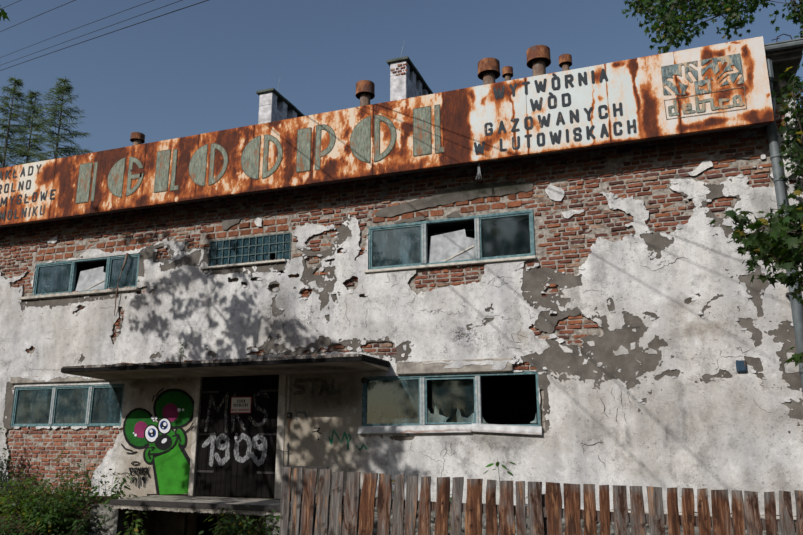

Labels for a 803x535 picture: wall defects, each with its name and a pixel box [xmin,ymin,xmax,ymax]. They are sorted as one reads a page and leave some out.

spalling [0,96,785,434]
peeling [723,265,803,435]